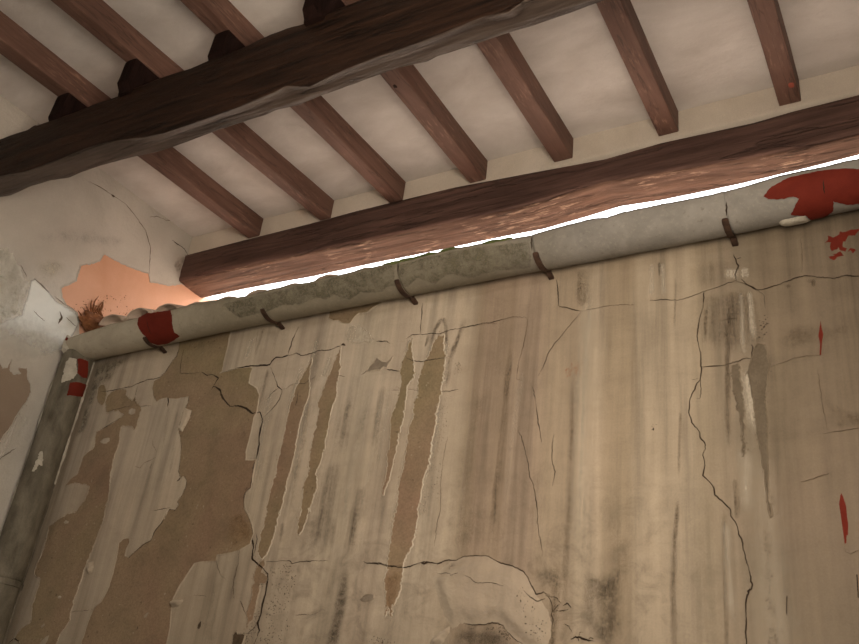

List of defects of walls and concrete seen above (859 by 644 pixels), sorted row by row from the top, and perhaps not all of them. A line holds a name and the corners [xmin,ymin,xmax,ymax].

flaking render [0,358,31,442]
flaking render [13,384,142,644]
flaking render [60,253,218,335]
flaking render [81,331,342,644]
flaking render [360,331,448,621]
crack [339,238,859,644]